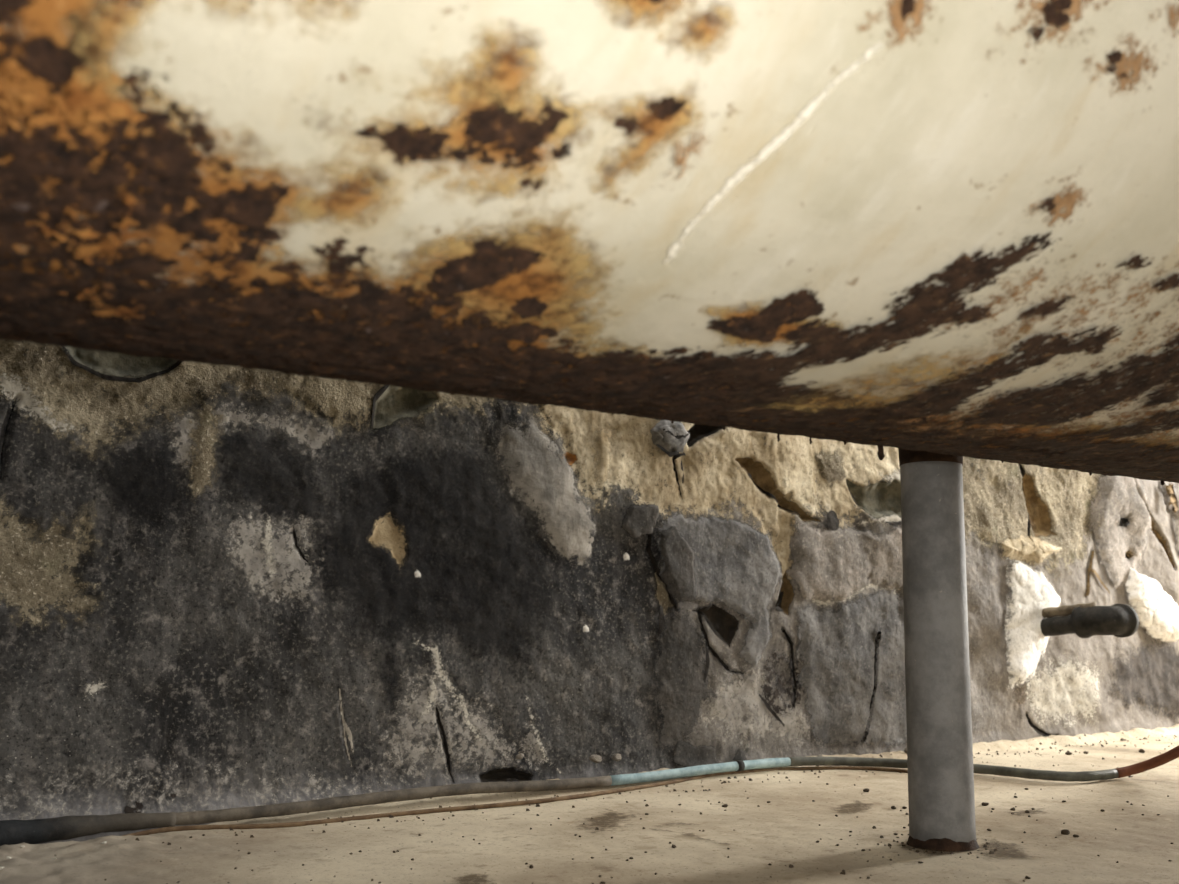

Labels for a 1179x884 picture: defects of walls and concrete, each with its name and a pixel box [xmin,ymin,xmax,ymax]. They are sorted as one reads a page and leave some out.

rust [0,0,1179,485]
crack [0,403,16,478]
leakage [0,373,75,434]
spalling [0,339,385,503]
spalling [401,391,505,427]
leakage [111,402,561,802]
spalling [369,515,407,566]
spalling [518,404,907,767]
spalling [962,456,1152,588]
leakage [85,683,105,697]
crack [862,631,881,742]
leakage [0,762,279,820]